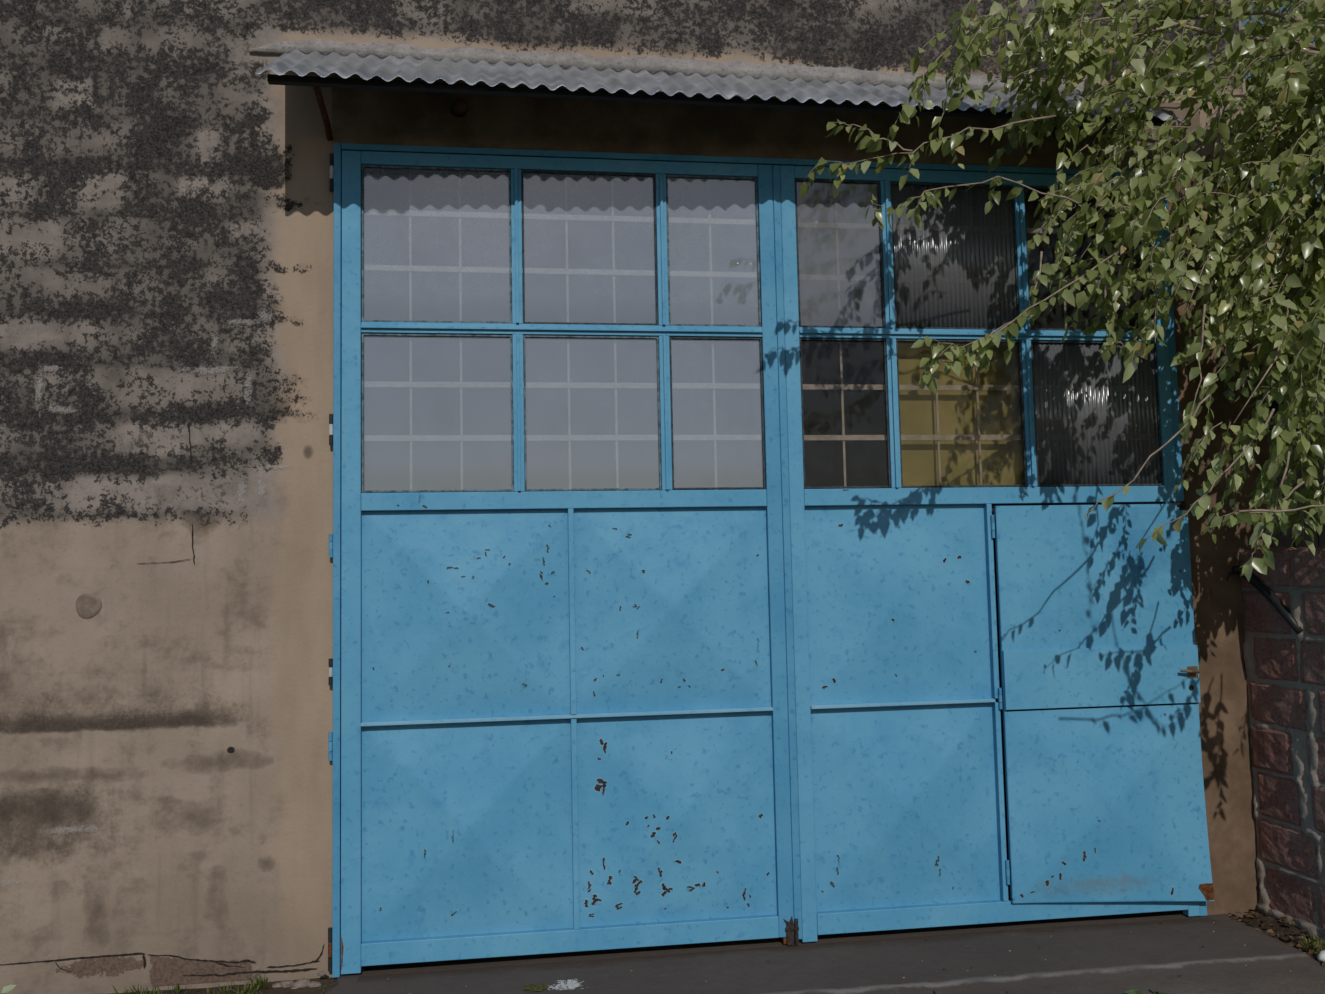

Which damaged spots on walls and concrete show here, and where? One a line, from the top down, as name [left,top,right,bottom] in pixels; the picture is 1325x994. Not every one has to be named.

leakage [1076,0,1243,91]
leakage [0,0,1065,528]
leakage [0,712,233,733]
rust [1199,883,1215,901]
spalling [56,955,259,986]